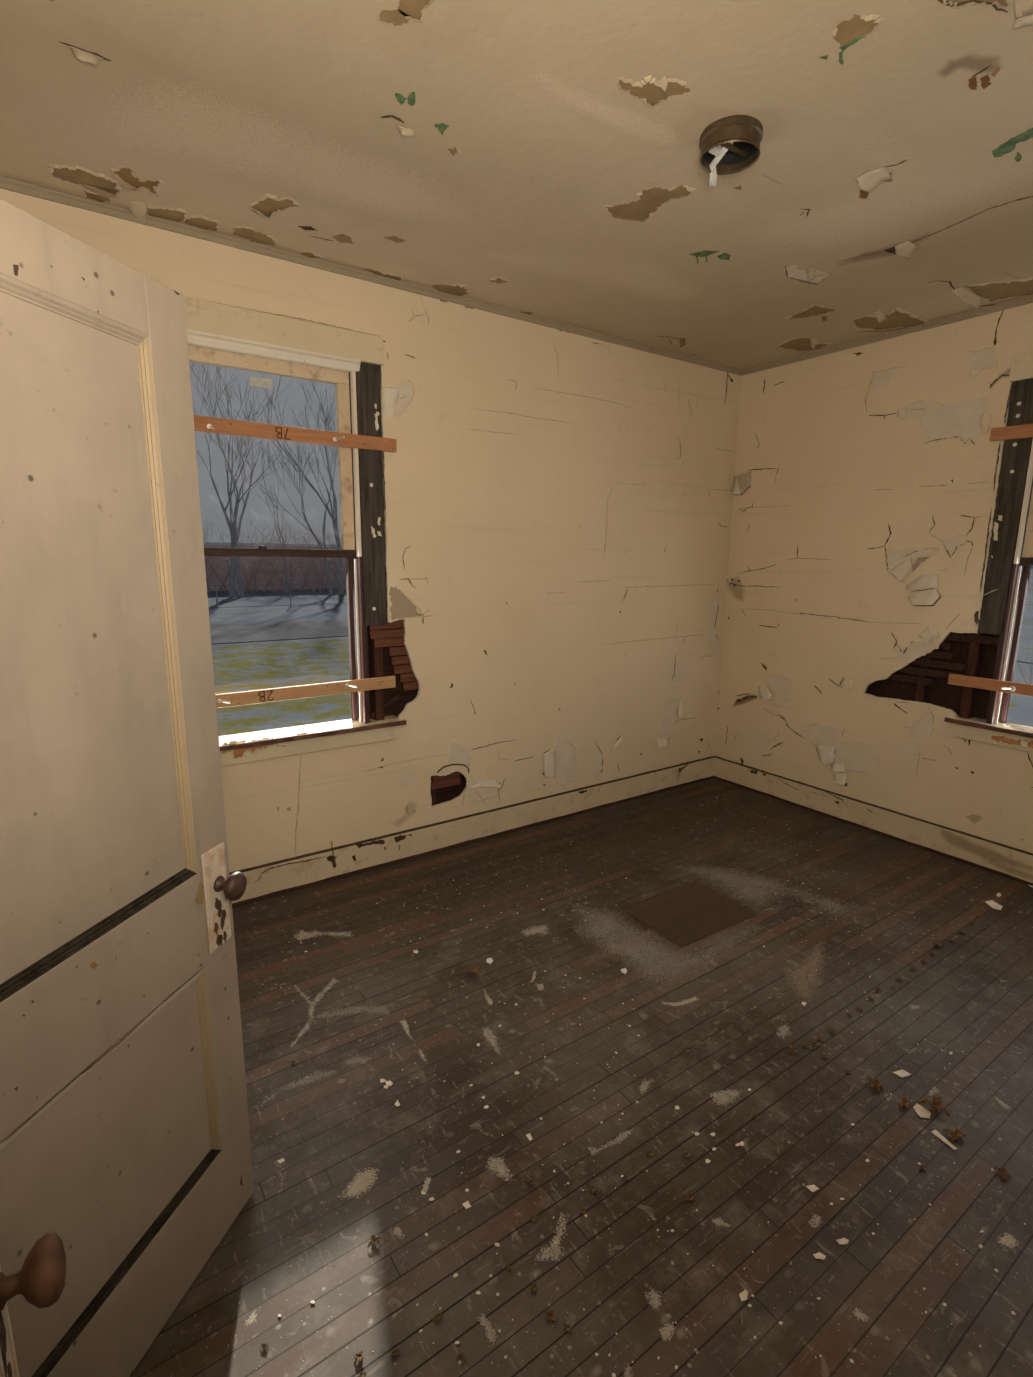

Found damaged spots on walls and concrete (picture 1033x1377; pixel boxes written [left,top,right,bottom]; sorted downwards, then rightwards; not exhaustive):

peeling [376,0,434,26]
peeling [938,0,1033,29]
peeling [819,14,882,65]
peeling [613,75,690,109]
peeling [47,164,300,246]
peeling [604,185,697,222]
crack [838,196,1033,262]
peeling [363,268,474,309]
peeling [928,271,1033,309]
peeling [209,301,436,719]
peeling [863,382,1013,718]
peeling [430,764,505,808]